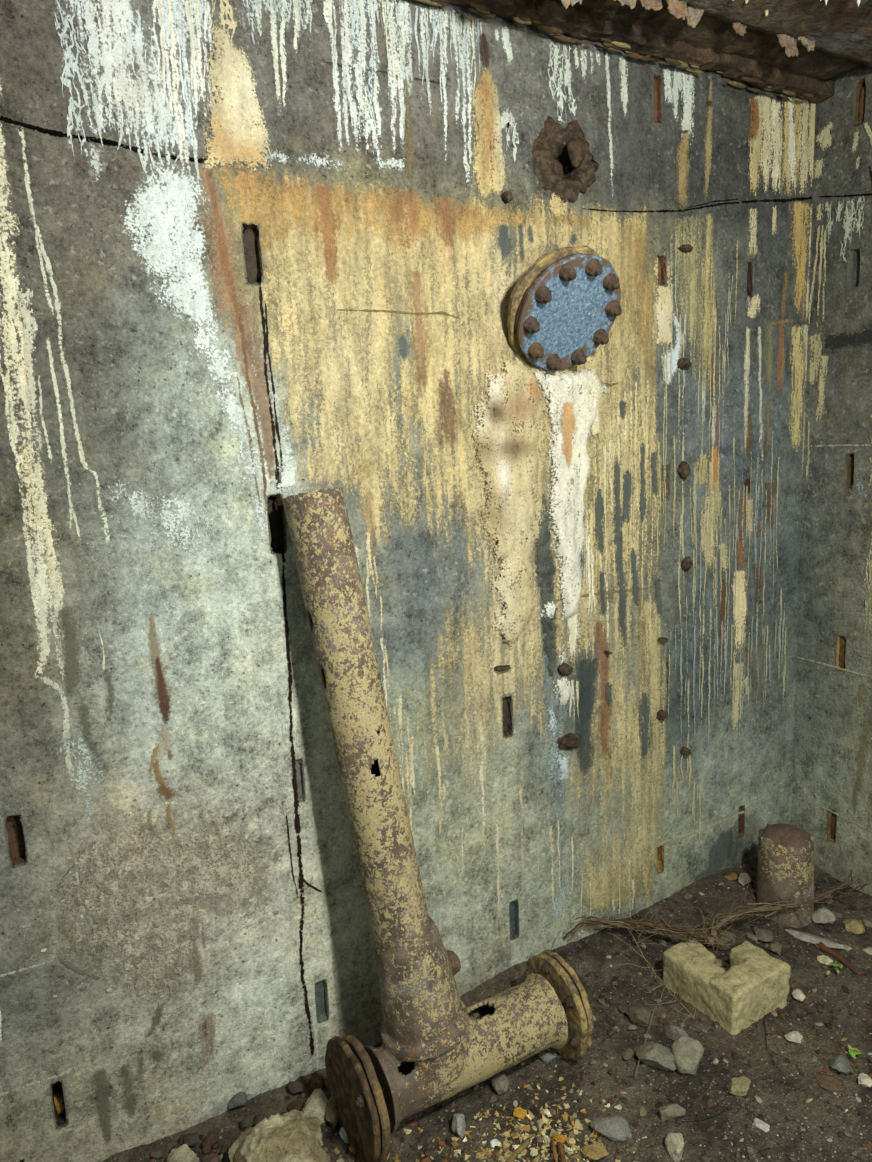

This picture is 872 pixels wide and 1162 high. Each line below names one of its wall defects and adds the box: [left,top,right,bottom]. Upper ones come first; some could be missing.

corrosion [613,0,704,28]
corrosion [777,34,815,57]
crack [0,115,208,164]
corrosion [471,34,519,198]
corrosion [532,116,599,203]
crack [583,167,872,213]
damp [852,123,872,169]
corrosion [196,166,275,516]
damp [0,124,213,824]
damp [54,0,865,932]
damp [863,532,872,641]
crack [259,283,322,1056]